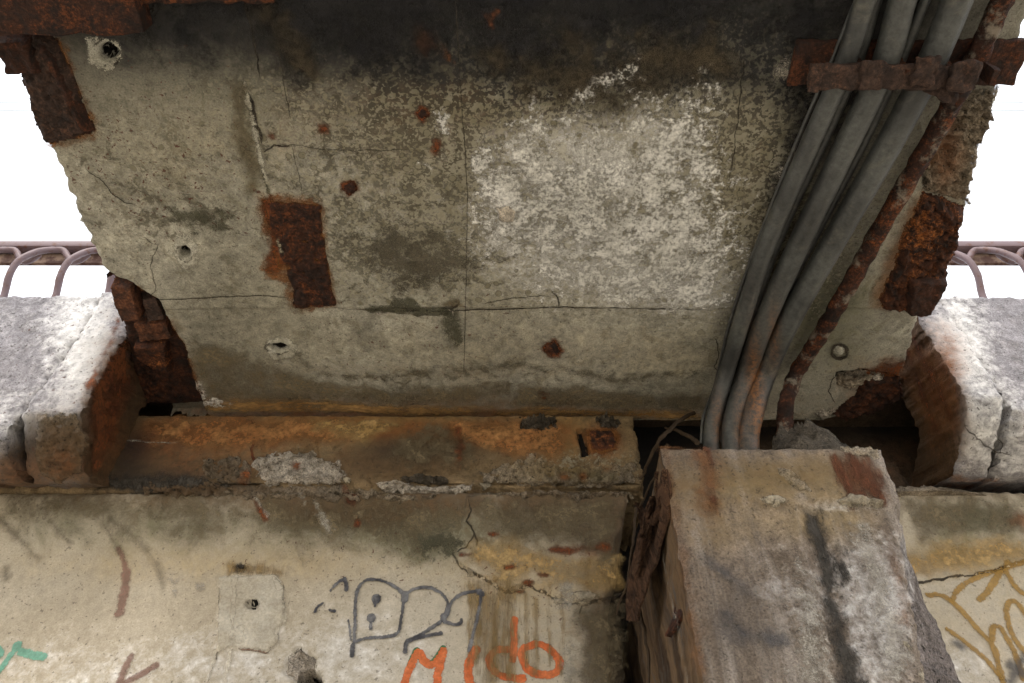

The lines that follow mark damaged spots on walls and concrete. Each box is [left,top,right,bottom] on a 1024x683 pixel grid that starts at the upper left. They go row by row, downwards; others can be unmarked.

crack [242,3,423,197]
leakage [164,0,760,314]
crack [348,0,712,366]
corrosion [256,192,336,313]
corrosion [85,312,700,472]
spalling [836,369,884,389]
crack [964,423,1013,457]
spalling [143,446,639,504]
corrosion [832,453,885,506]
crack [457,497,478,552]
crack [918,565,1006,584]